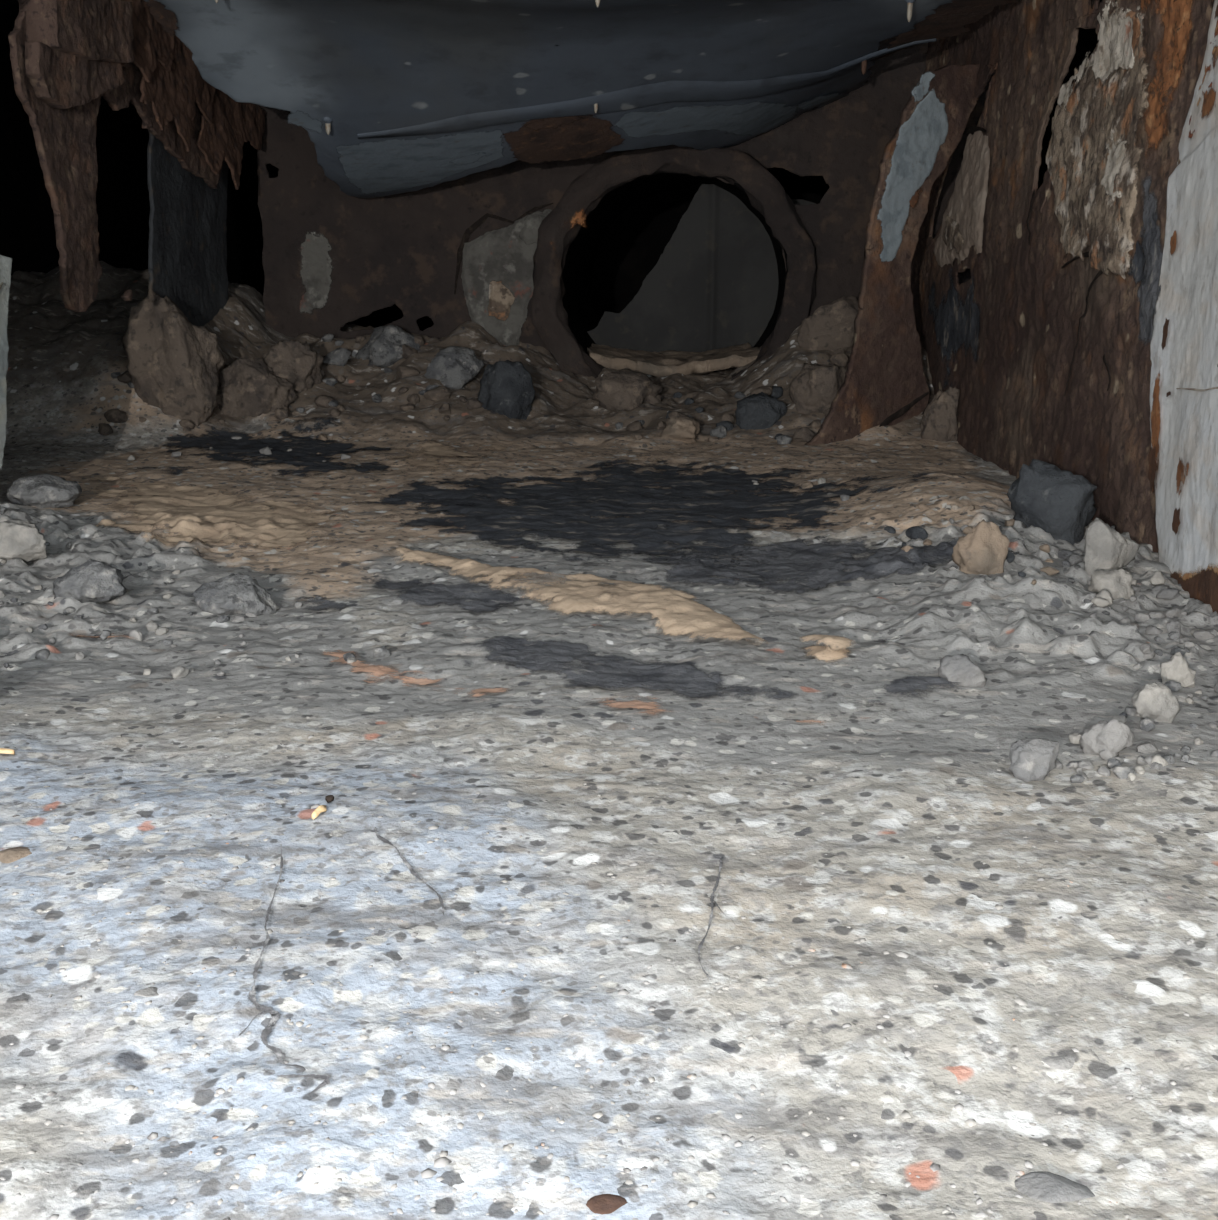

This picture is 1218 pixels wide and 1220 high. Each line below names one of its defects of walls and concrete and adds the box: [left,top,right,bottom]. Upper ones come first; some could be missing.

peeling [877,72,949,262]
corrosion [868,0,1019,62]
spalling [934,131,990,267]
crack [1026,0,1100,245]
spalling [1046,1,1150,280]
corrosion [1133,0,1193,153]
corrosion [1188,0,1218,138]
corrosion [1161,319,1169,349]
corrosion [1148,371,1171,494]
corrosion [1172,458,1189,534]
crack [374,827,444,915]
crack [239,844,330,1094]